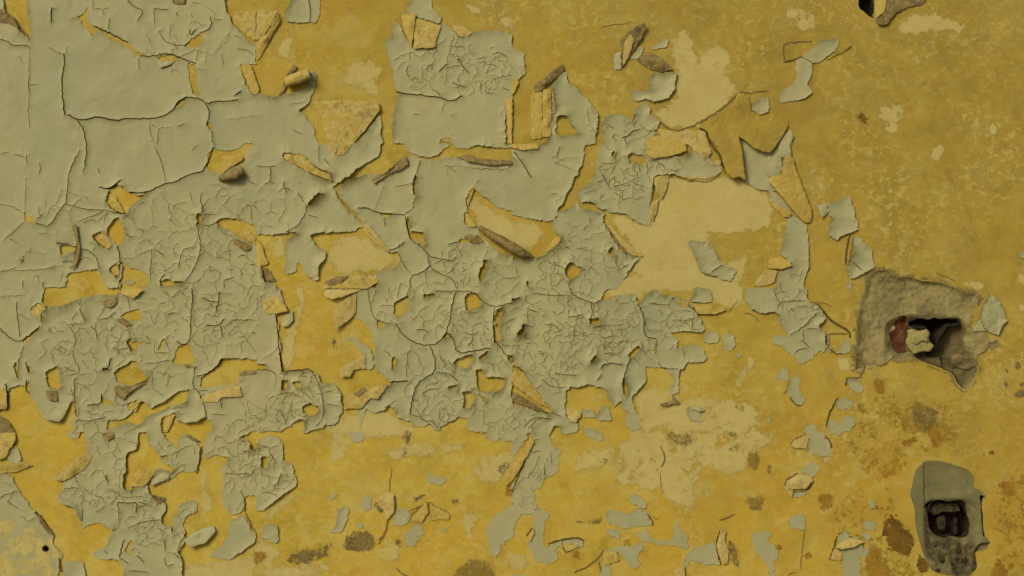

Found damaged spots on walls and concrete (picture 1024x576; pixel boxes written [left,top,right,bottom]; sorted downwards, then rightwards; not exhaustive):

crack [394,35,514,115]
peeling [779,38,851,104]
peeling [874,0,966,35]
crack [0,1,339,573]
peeling [0,0,643,576]
crack [339,86,865,573]
peeling [573,22,832,512]
spalling [818,196,1008,394]
peeling [600,493,729,576]
spalling [926,501,960,515]